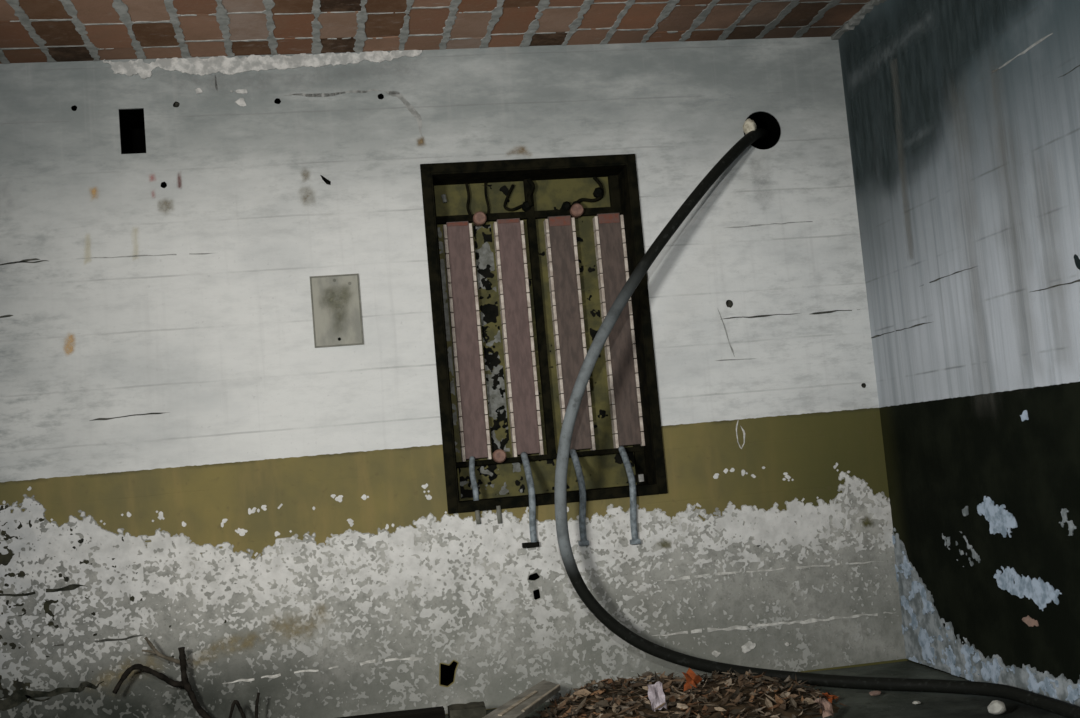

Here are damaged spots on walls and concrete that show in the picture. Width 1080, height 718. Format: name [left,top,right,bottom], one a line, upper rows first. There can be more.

leakage [845,0,1018,186]
peeling [614,452,636,484]
peeling [0,462,1080,718]